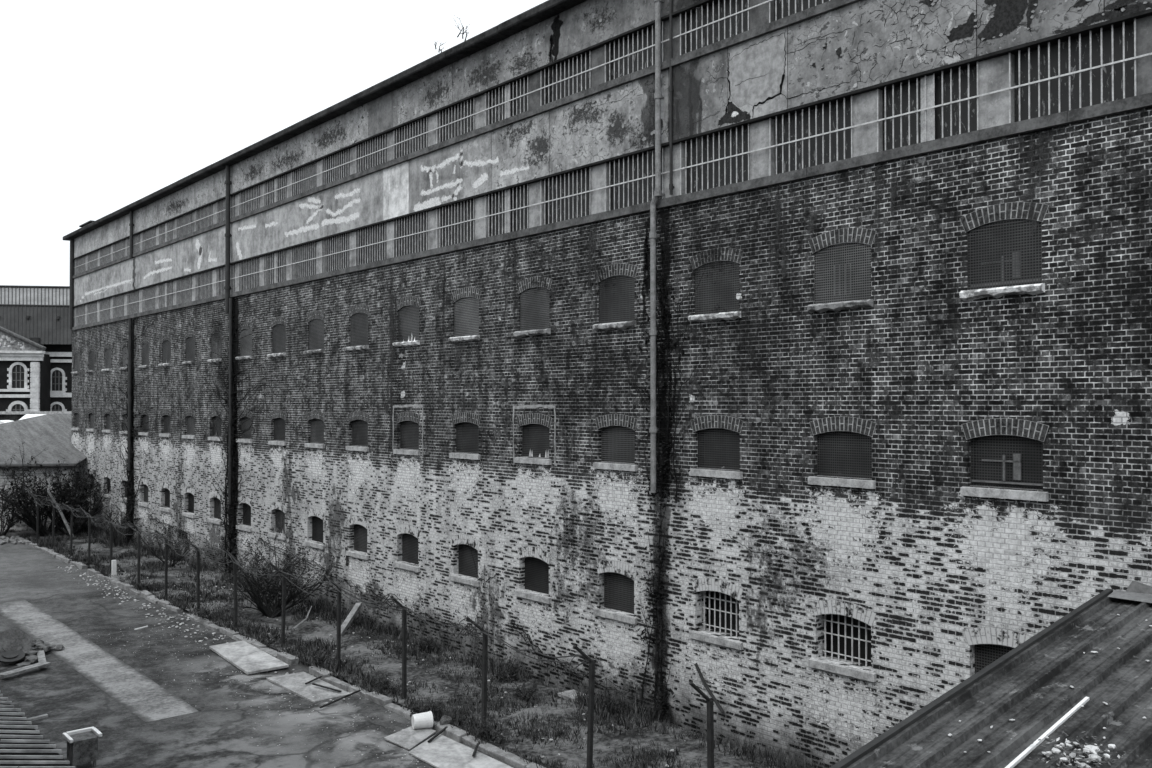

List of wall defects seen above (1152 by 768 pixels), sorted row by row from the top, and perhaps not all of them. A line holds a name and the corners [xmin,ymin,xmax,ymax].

water stain [548,14,563,102]
flaking render [718,99,751,127]
crack [697,0,986,122]
flaking render [946,0,1038,43]
flaking render [1053,0,1152,33]
water stain [71,297,255,571]
water stain [575,207,798,722]
water stain [268,446,588,661]
water stain [803,486,888,580]
water stain [942,495,1066,608]